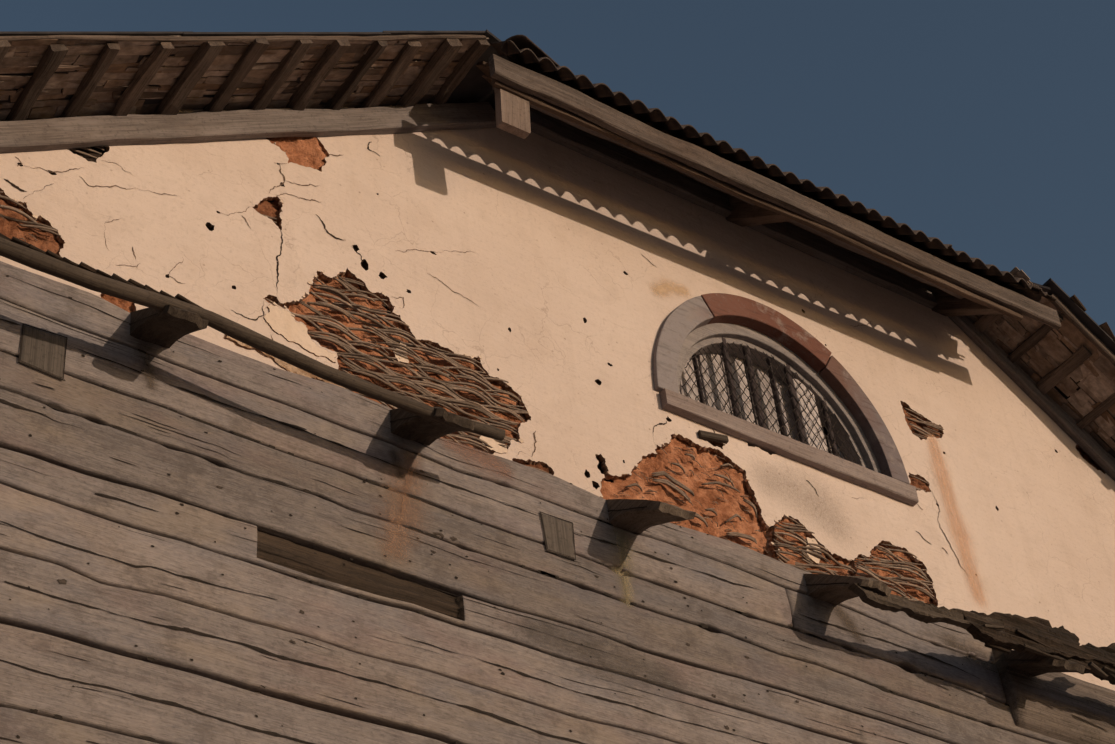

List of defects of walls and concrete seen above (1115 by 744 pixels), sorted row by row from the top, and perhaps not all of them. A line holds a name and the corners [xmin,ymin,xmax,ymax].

flaking render [0,188,65,256]
crack [5,157,170,267]
flaking render [253,196,284,230]
flaking render [266,137,329,172]
crack [0,274,551,516]
flaking render [223,268,554,475]
flaking render [900,401,944,440]
crack [0,521,277,600]
crack [0,581,586,744]
crack [369,572,775,744]
crack [314,479,998,679]
flaking render [595,430,939,606]